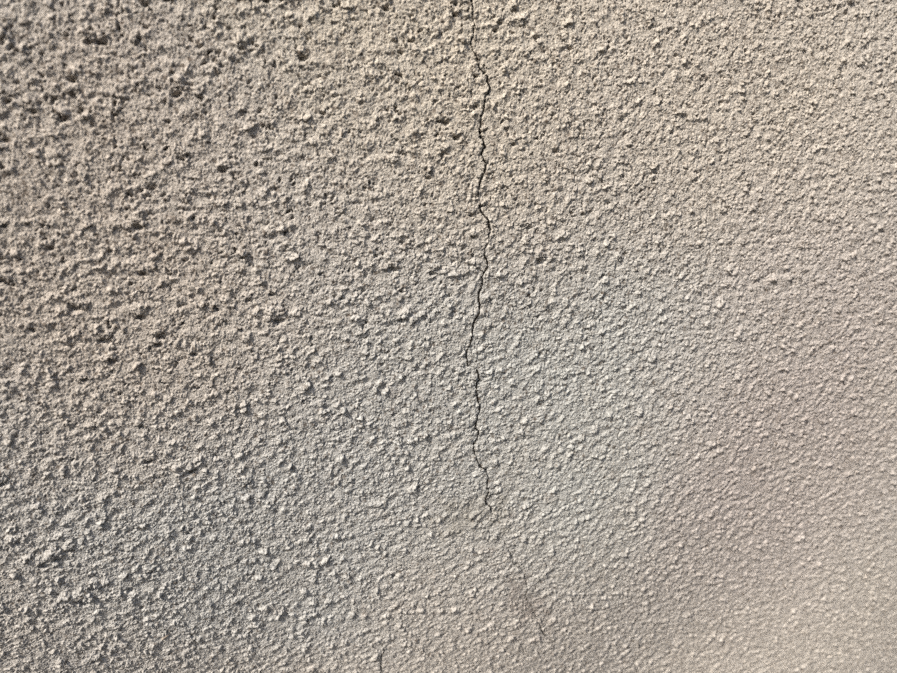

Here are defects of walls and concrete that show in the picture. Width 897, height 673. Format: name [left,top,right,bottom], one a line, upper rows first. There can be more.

crack [466,0,549,640]